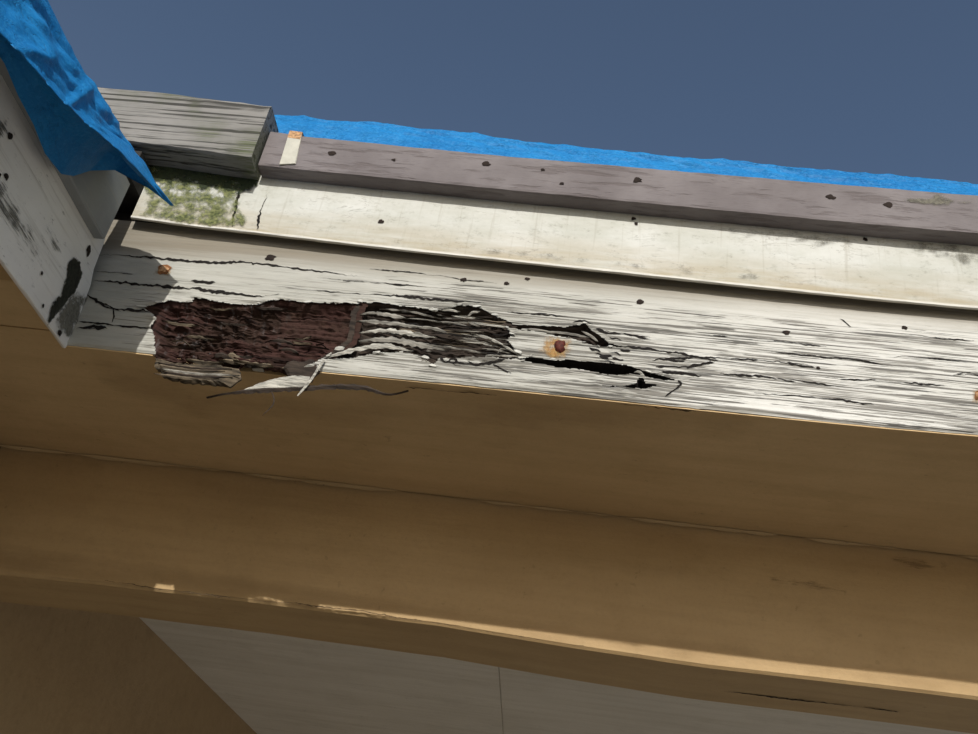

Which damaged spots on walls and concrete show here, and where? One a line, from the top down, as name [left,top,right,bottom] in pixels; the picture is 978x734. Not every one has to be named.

leakage [0,183,36,253]
crack [232,193,267,229]
crack [78,254,493,330]
spalling [320,299,533,367]
crack [439,356,509,372]
crack [513,310,564,318]
crack [591,329,978,412]
crack [735,692,896,712]